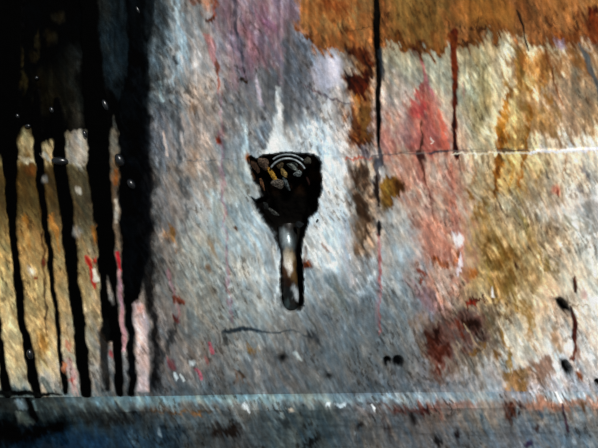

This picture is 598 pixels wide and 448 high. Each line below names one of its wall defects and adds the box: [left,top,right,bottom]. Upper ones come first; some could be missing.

water stain [0,0,235,428]
water stain [249,209,280,335]
water stain [324,400,349,409]
rust [291,0,413,272]
crack [355,143,530,161]
rust [379,0,598,448]